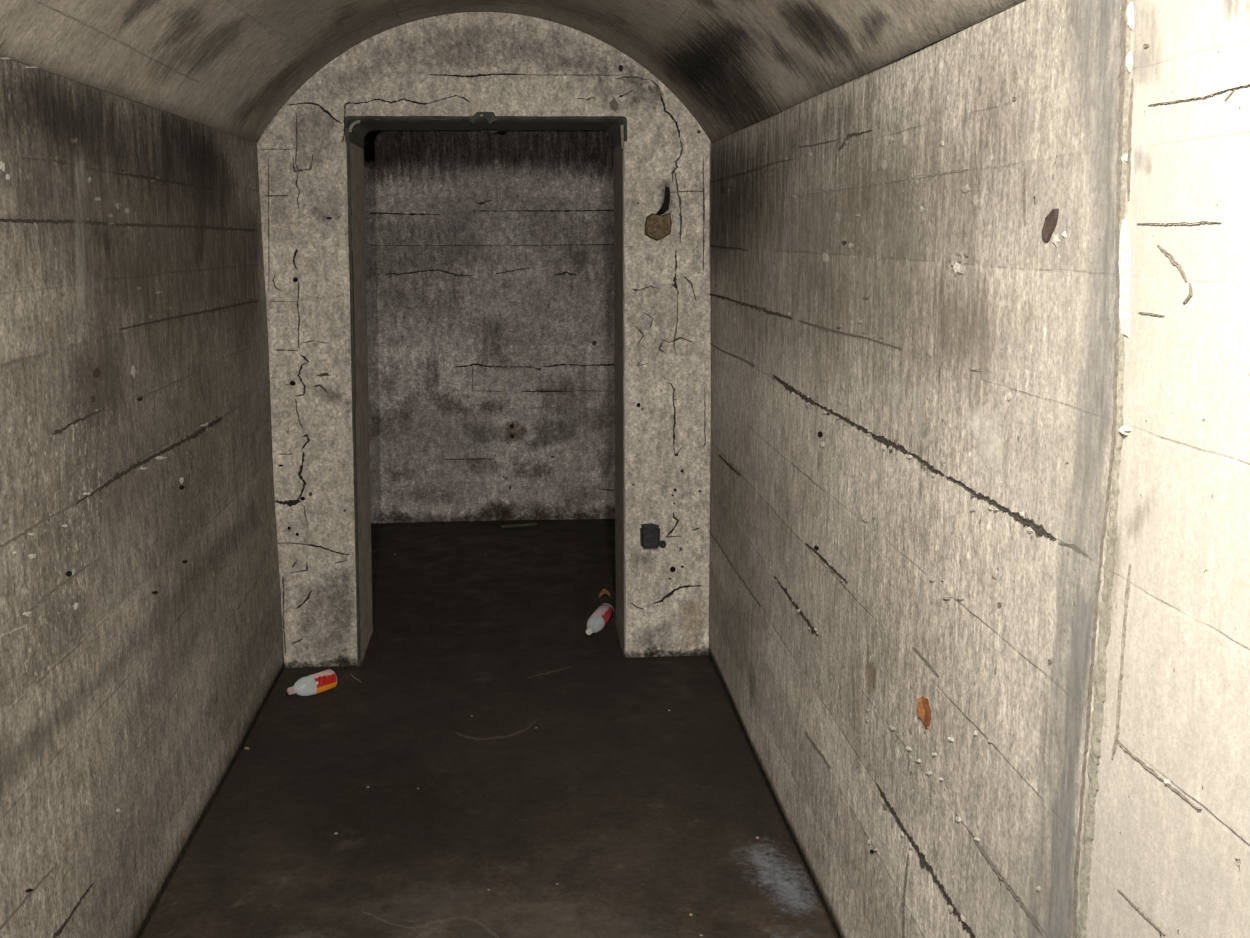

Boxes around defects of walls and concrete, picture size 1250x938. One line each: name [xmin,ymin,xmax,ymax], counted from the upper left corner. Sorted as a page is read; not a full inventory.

leakage [663,22,767,130]
leakage [780,0,883,60]
leakage [3,83,256,299]
crack [0,73,902,656]
crack [710,0,1250,938]